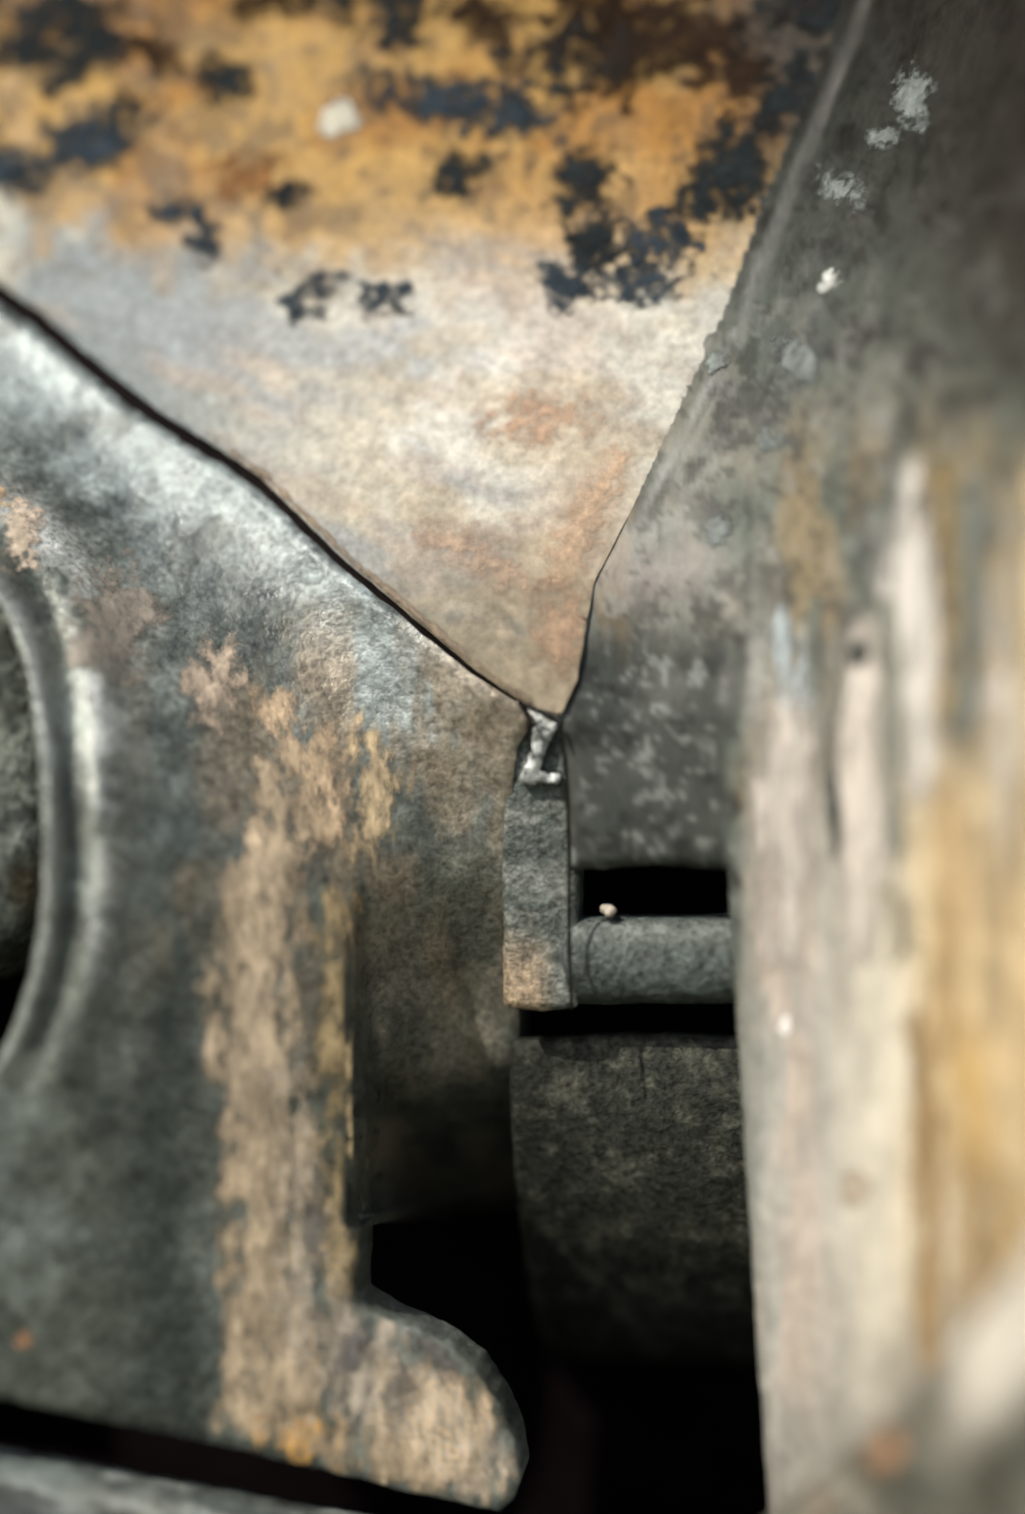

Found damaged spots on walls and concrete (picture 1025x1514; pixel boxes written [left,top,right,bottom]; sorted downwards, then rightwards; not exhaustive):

corrosion [876,777,1025,1377]